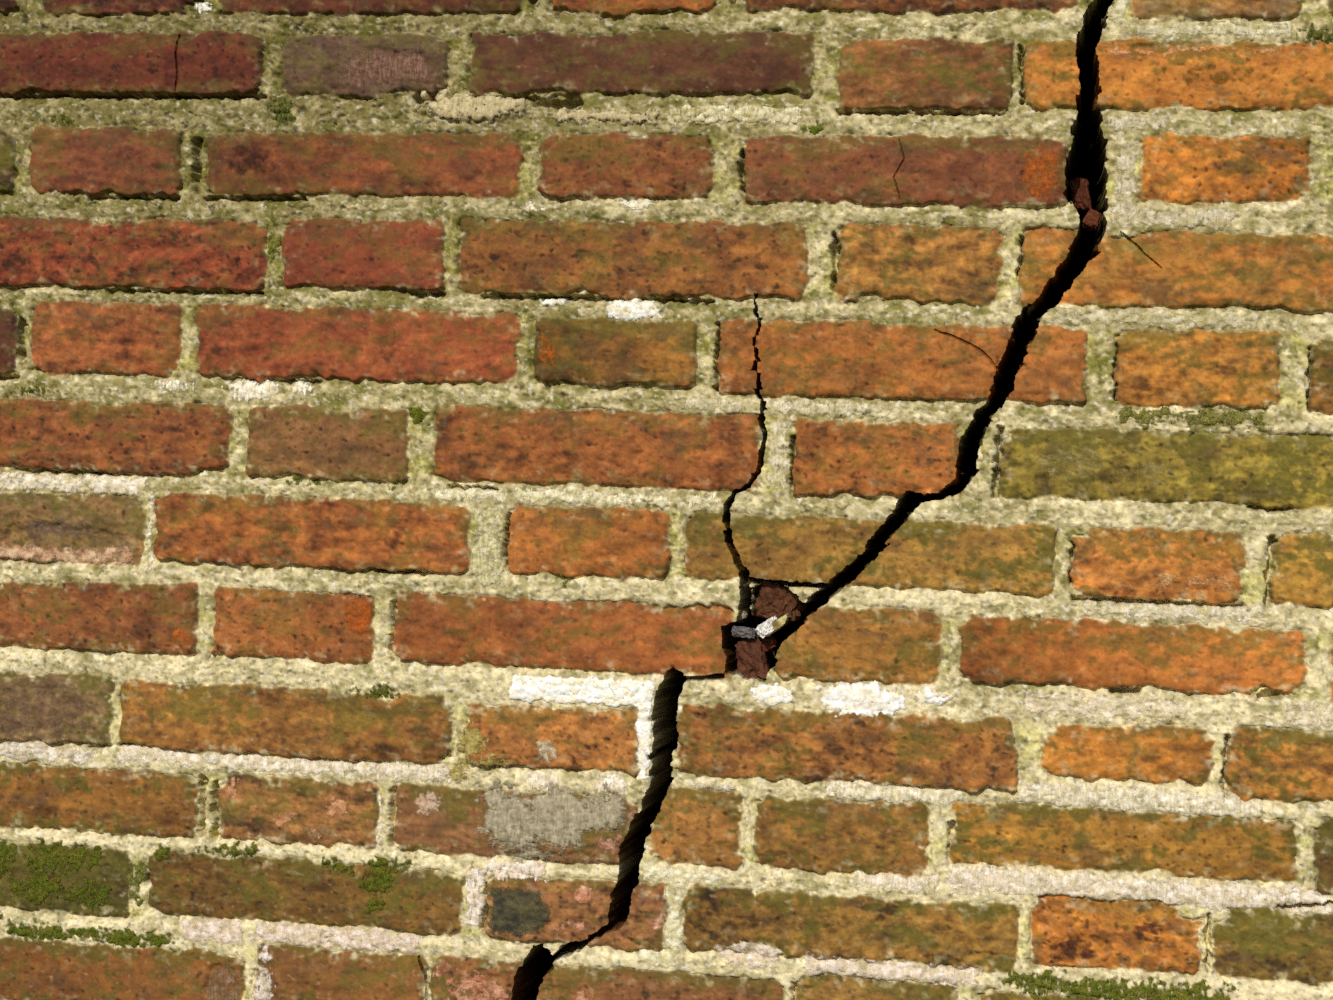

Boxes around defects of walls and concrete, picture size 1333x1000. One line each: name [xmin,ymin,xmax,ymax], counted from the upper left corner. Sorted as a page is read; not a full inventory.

crack [511,0,1163,1000]
leakage [508,674,655,795]
leakage [750,683,794,706]
leakage [814,680,954,717]